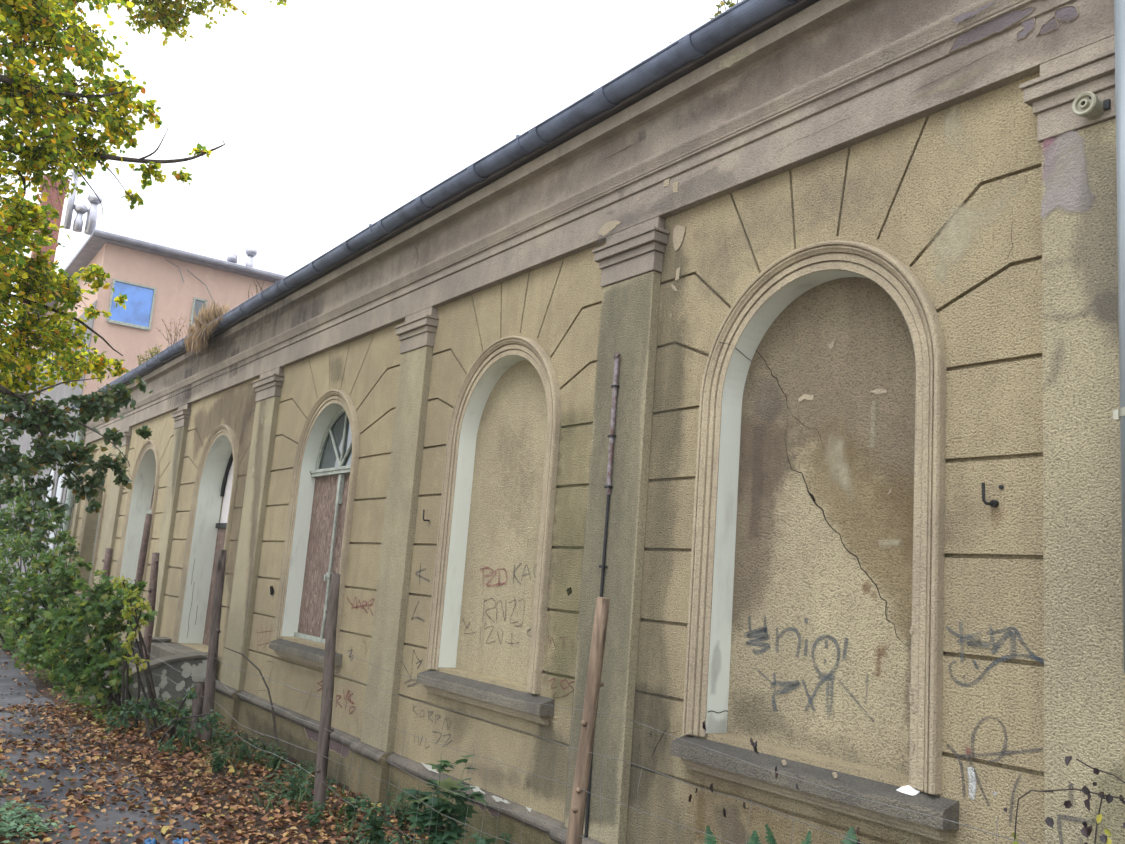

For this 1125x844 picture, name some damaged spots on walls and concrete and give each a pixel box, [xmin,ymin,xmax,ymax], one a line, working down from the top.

peeling [948,0,1079,53]
peeling [1041,130,1093,216]
crack [719,342,908,646]
peeling [121,660,207,709]